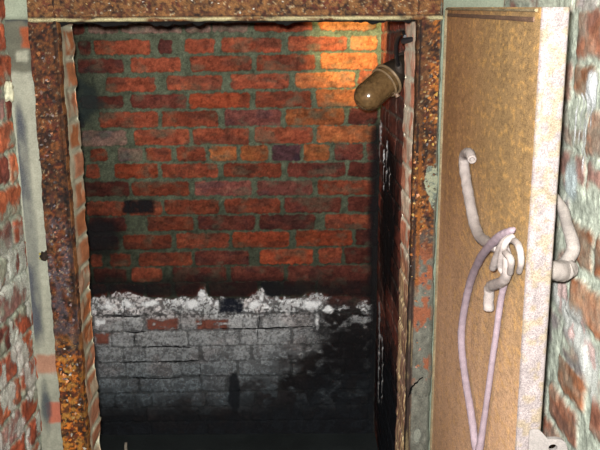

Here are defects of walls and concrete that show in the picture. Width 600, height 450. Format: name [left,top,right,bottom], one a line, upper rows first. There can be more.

corrosion [35,71,59,165]
corrosion [411,66,439,237]
corrosion [55,345,83,441]
damp [91,288,397,450]